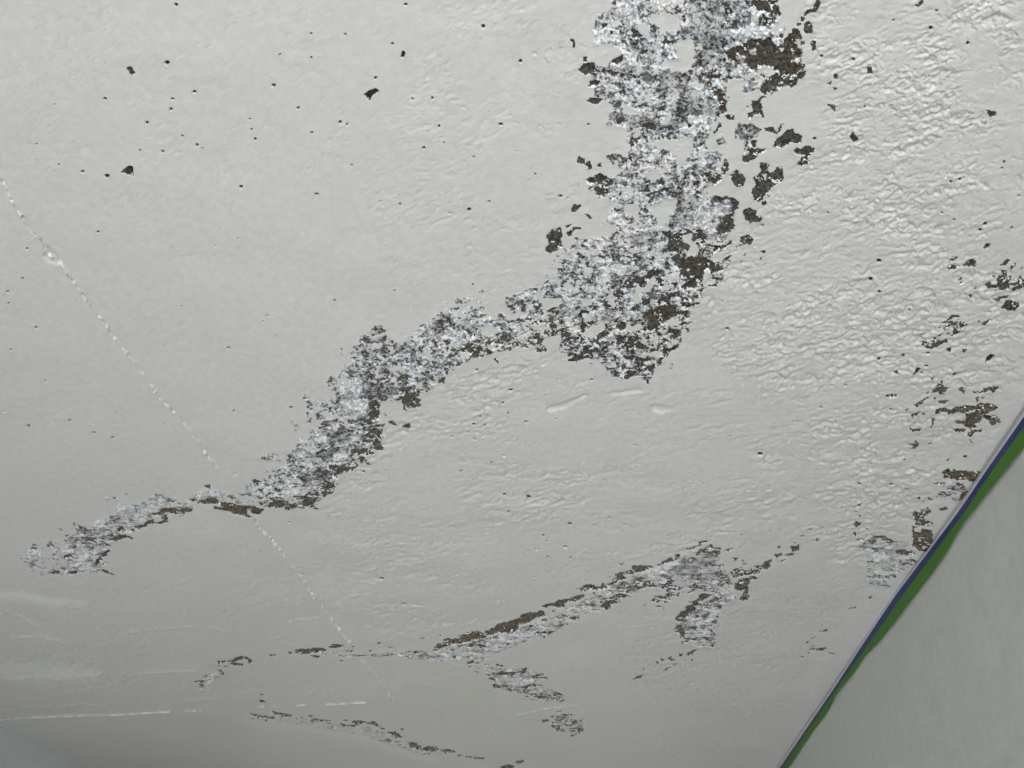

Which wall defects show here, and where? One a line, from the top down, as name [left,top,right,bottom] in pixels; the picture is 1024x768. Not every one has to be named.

peeling [20,0,821,577]
peeling [947,256,1024,311]
peeling [919,315,989,352]
peeling [903,372,1001,460]
peeling [853,455,980,599]
peeling [194,656,253,690]
peeling [270,528,818,737]
peeling [245,693,484,759]